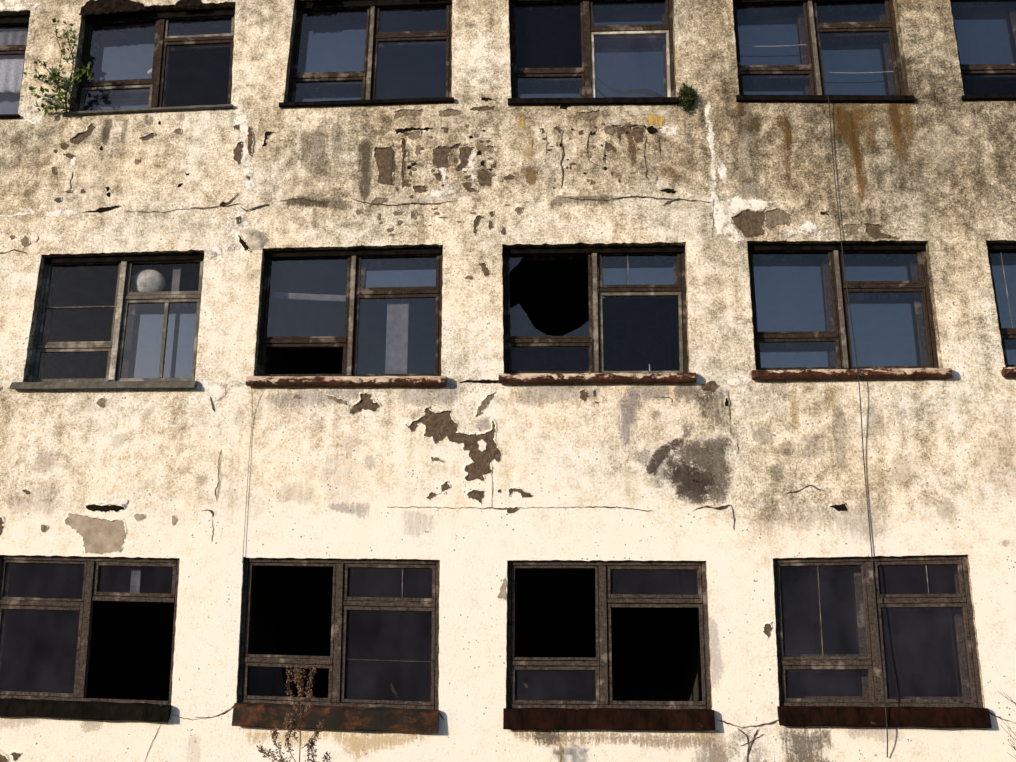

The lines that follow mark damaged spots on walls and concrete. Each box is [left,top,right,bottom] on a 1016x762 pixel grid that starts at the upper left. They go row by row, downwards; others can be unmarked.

spalling [79,0,145,16]
spalling [355,96,515,236]
rust [837,111,867,201]
rust [888,102,913,155]
crack [82,194,323,213]
spalling [711,196,900,244]
peeling [63,498,147,556]
crack [201,451,222,536]
peeling [404,392,502,505]
crack [390,468,652,511]
water stain [646,427,731,503]
crack [693,505,735,530]